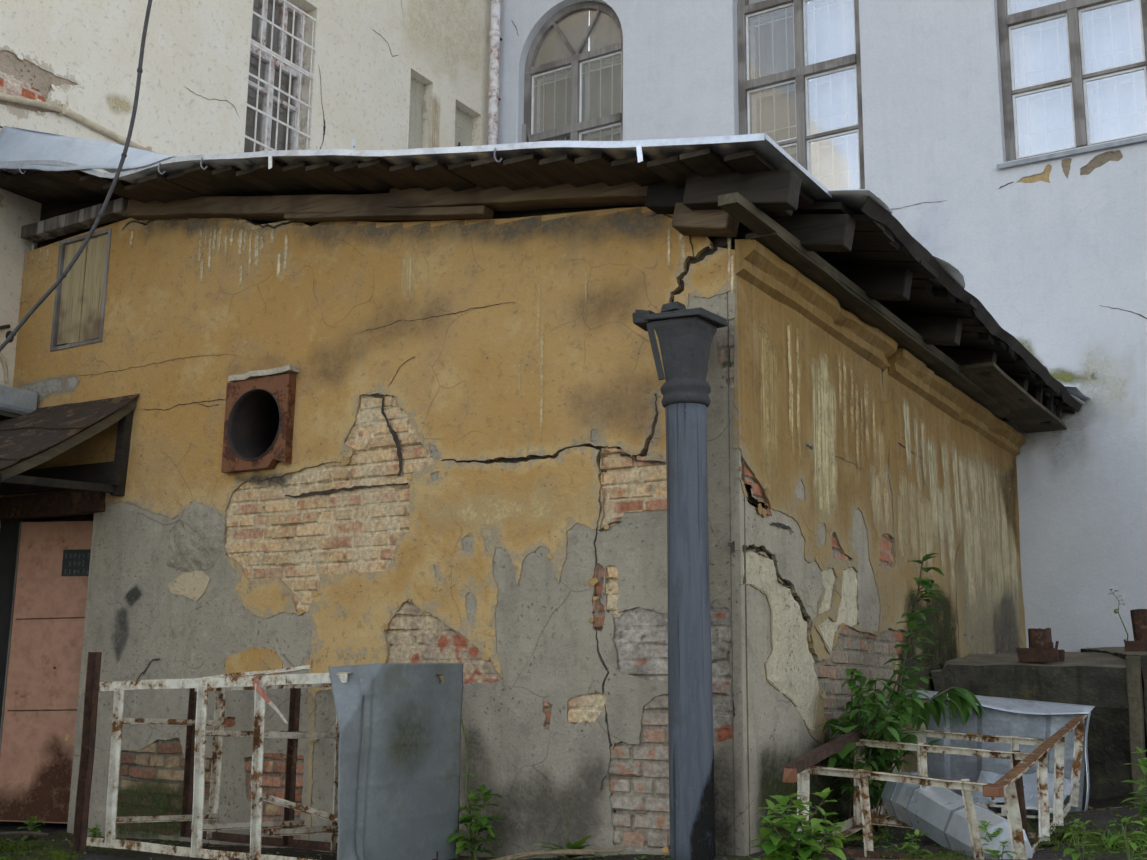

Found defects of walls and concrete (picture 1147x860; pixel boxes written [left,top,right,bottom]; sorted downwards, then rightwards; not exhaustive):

flaking render [0,50,78,114]
peeling [65,394,444,852]
peeling [383,429,670,859]
crack [446,412,663,473]
crack [650,213,731,302]
peeling [687,290,908,856]
water stain [760,325,1021,701]
flaking render [1017,150,1123,183]